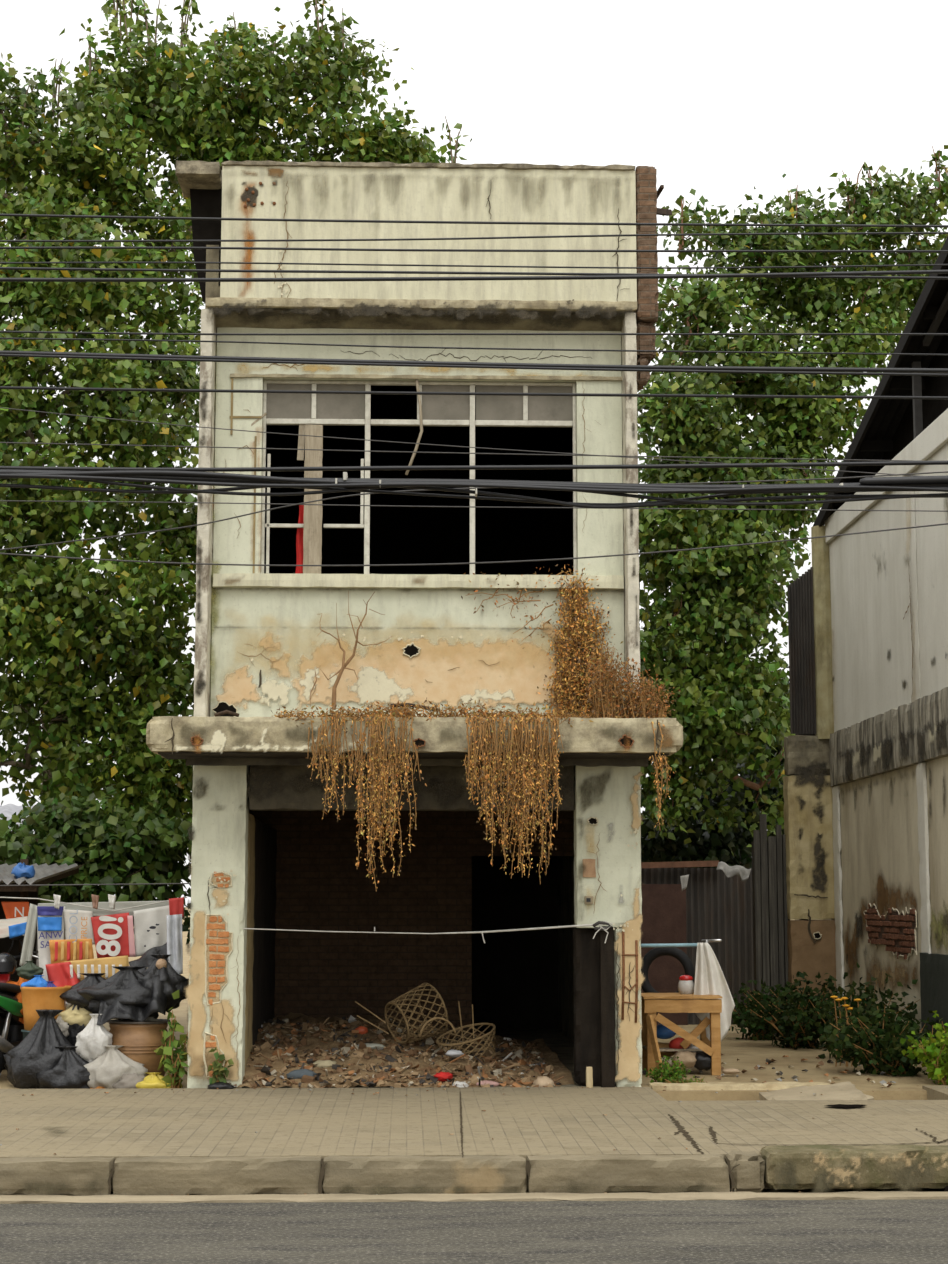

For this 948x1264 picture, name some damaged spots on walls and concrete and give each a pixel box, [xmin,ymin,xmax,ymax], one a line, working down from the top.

crack [612,209,625,302]
peeling [175,623,579,751]
damp [838,720,948,815]
damp [795,762,830,892]
peeling [186,870,239,1081]
flaking render [863,903,918,961]
crack [668,1114,948,1192]